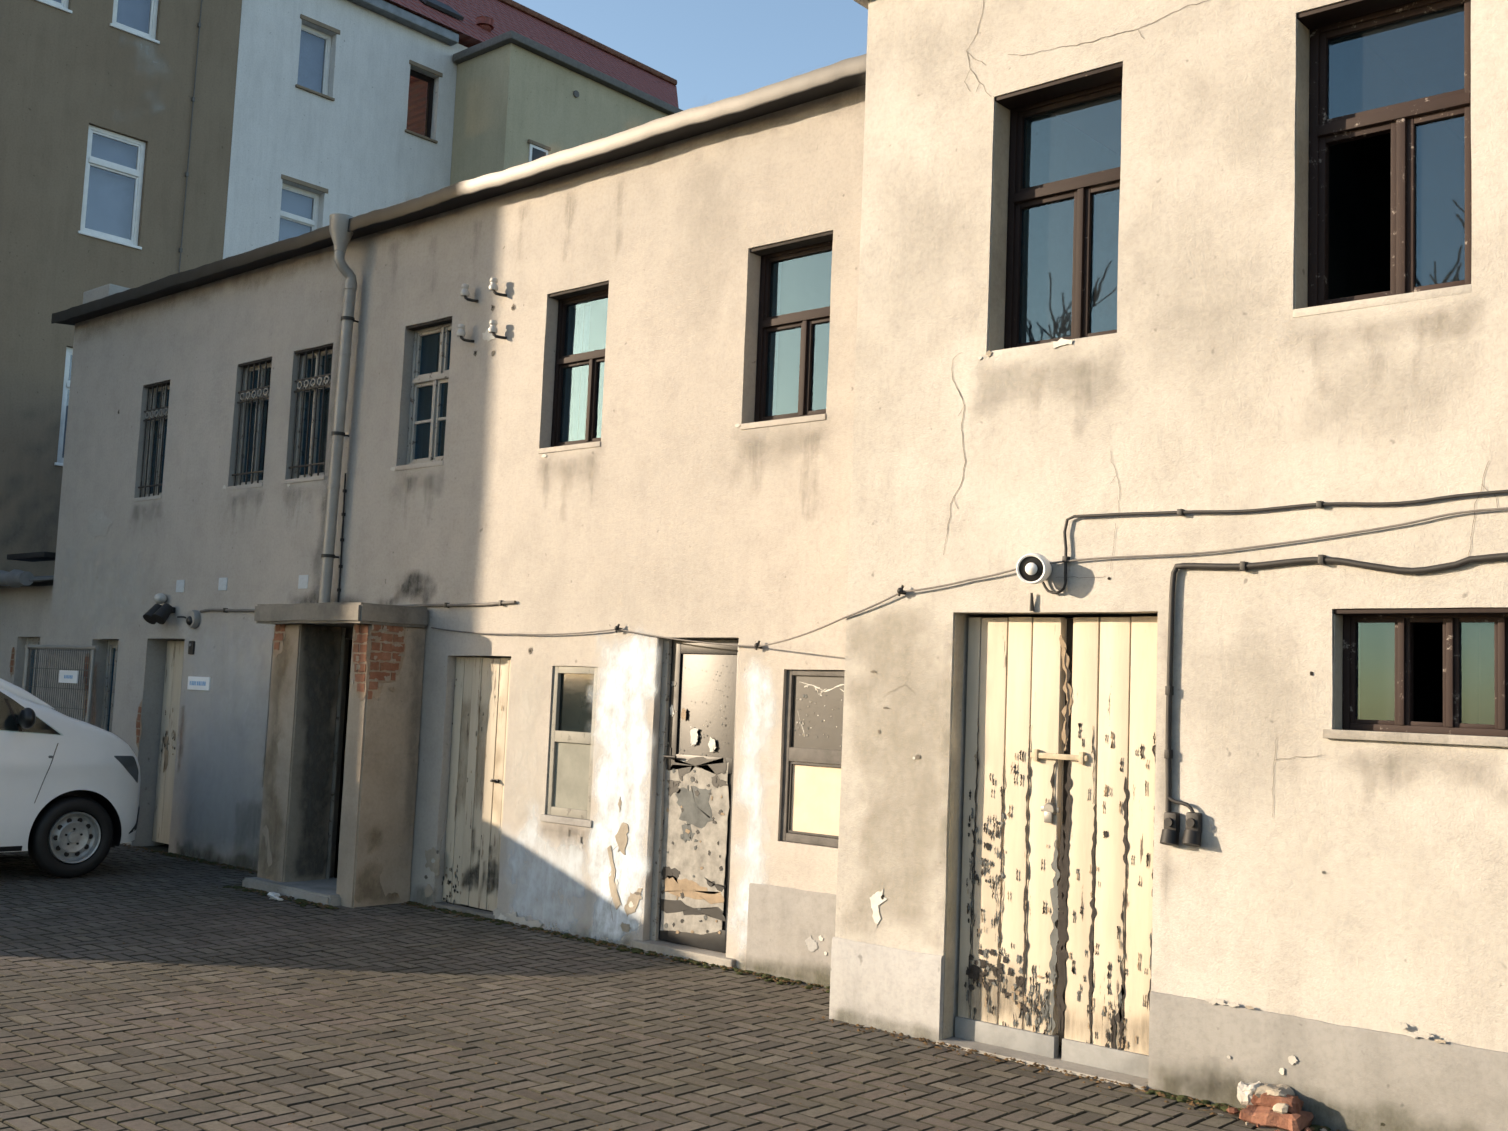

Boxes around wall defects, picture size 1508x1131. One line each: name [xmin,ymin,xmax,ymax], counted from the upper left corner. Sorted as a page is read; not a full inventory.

crack [964,0,1208,96]
crack [943,352,966,555]
flaking render [351,624,406,701]
flaking render [493,908,544,928]
flaking render [870,889,887,928]